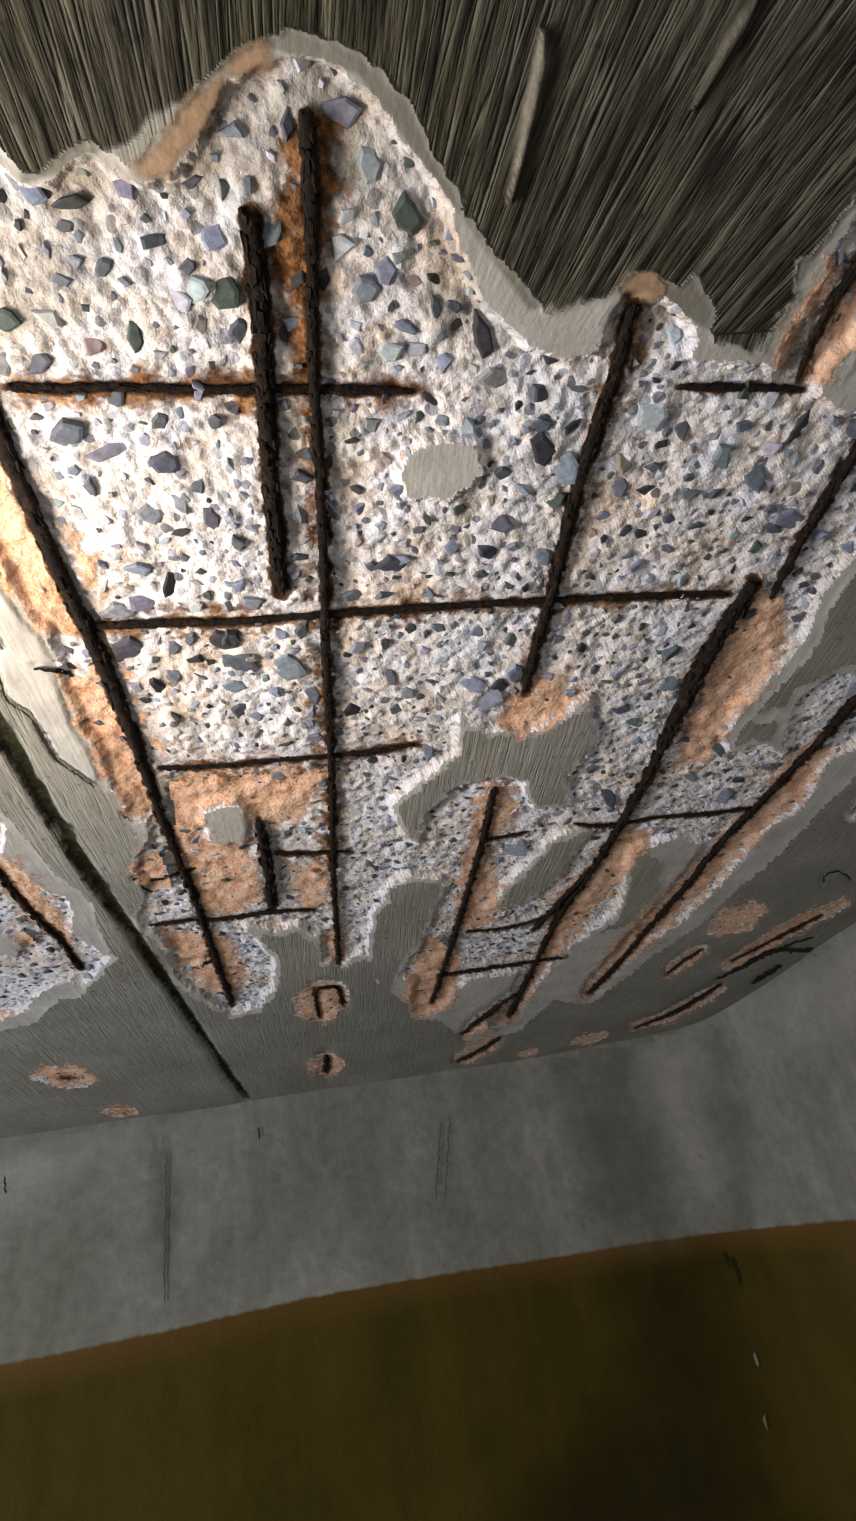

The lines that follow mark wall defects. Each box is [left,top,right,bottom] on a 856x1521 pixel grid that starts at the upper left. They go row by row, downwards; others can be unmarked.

rust [10,363,258,417]
rust [268,109,350,600]
rust [363,373,442,414]
rust [772,254,856,384]
rust [0,467,82,639]
rust [53,524,189,639]
spalling [0,28,856,1064]
rust [671,579,789,779]
rust [55,579,734,1025]
rust [453,823,650,1065]
rust [577,730,852,1032]
crack [161,1153,169,1301]